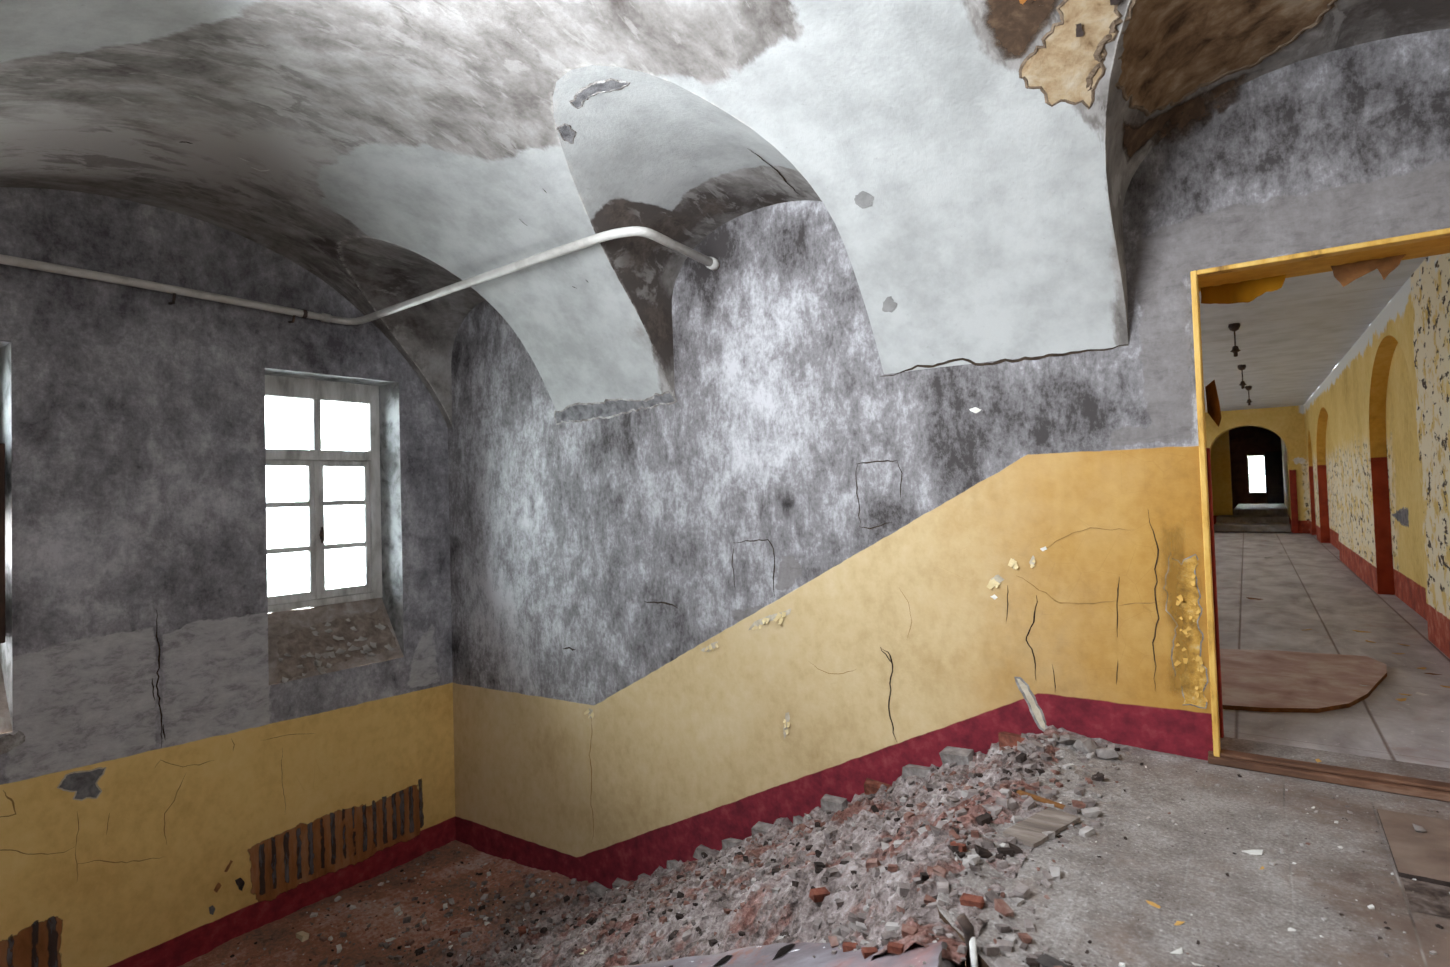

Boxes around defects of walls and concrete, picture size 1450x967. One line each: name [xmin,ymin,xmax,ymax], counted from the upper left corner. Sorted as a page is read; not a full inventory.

flaking render [1019,0,1338,117]
flaking render [1392,507,1409,528]
crack [810,588,912,741]
crack [1006,512,1159,689]
peeling [57,767,106,801]
crack [0,610,313,880]